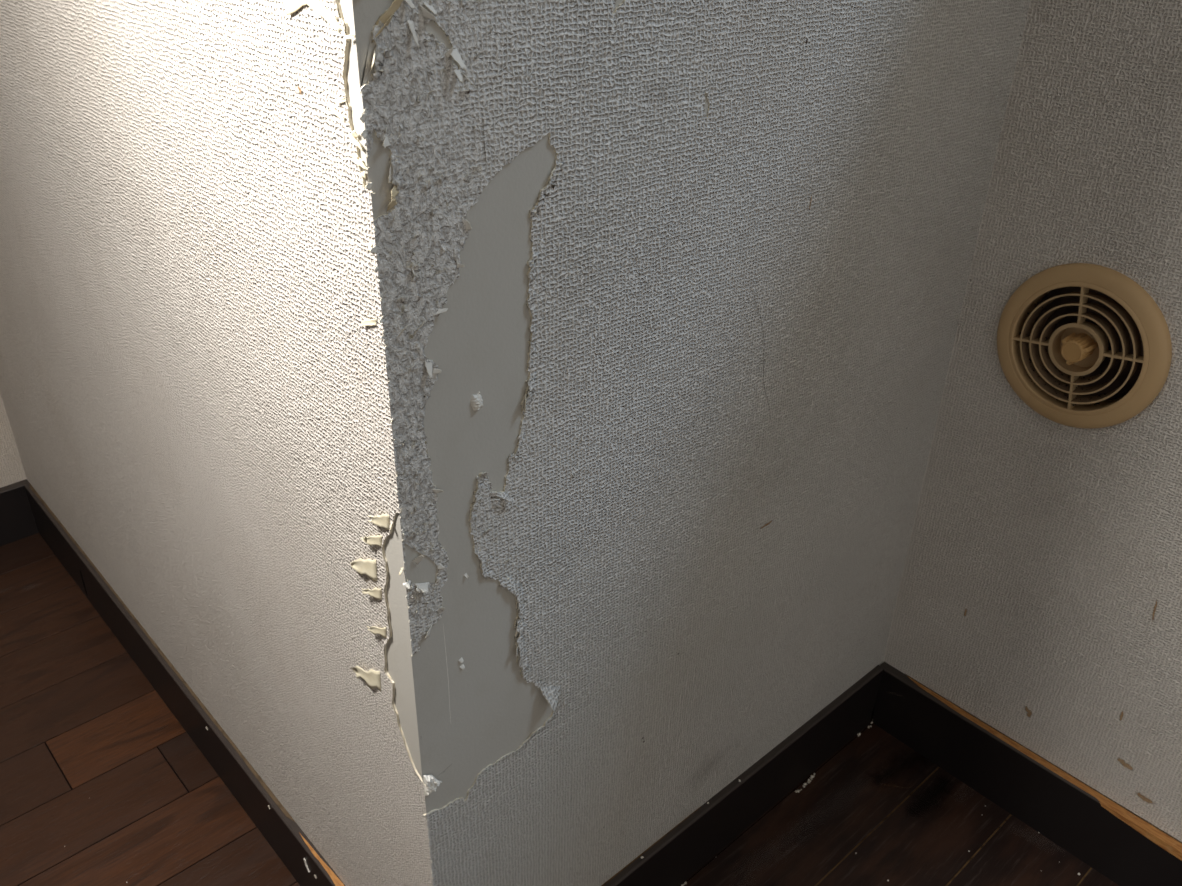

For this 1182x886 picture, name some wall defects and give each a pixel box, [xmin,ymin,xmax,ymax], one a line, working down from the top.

peeling [285,0,356,39]
spalling [384,0,480,97]
peeling [331,97,367,180]
peeling [350,514,426,600]
peeling [399,568,436,613]
peeling [351,666,381,692]